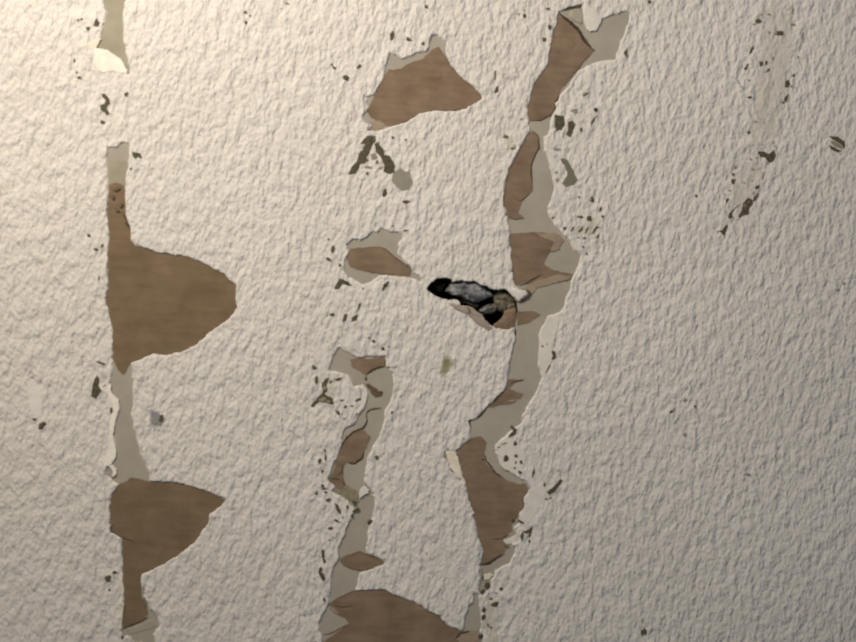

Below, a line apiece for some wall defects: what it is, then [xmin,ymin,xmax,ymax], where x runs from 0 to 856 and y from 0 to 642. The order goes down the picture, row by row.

peeling [77,0,130,75]
peeling [100,94,110,124]
peeling [91,142,237,642]
peeling [311,3,630,642]